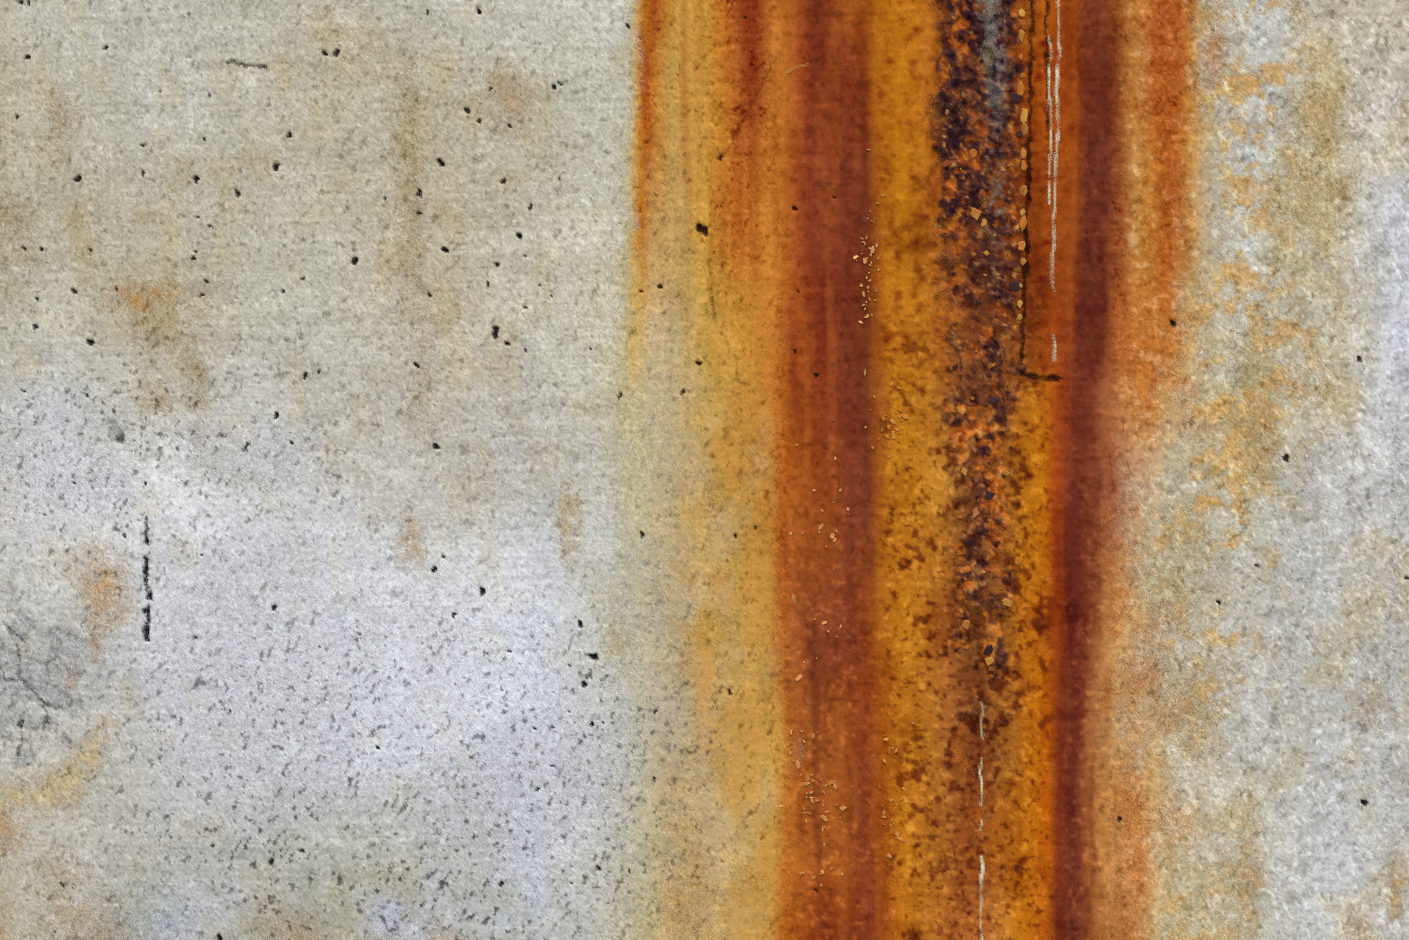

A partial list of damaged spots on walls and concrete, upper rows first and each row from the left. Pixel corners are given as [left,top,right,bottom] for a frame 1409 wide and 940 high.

corrosion [554,0,1380,940]